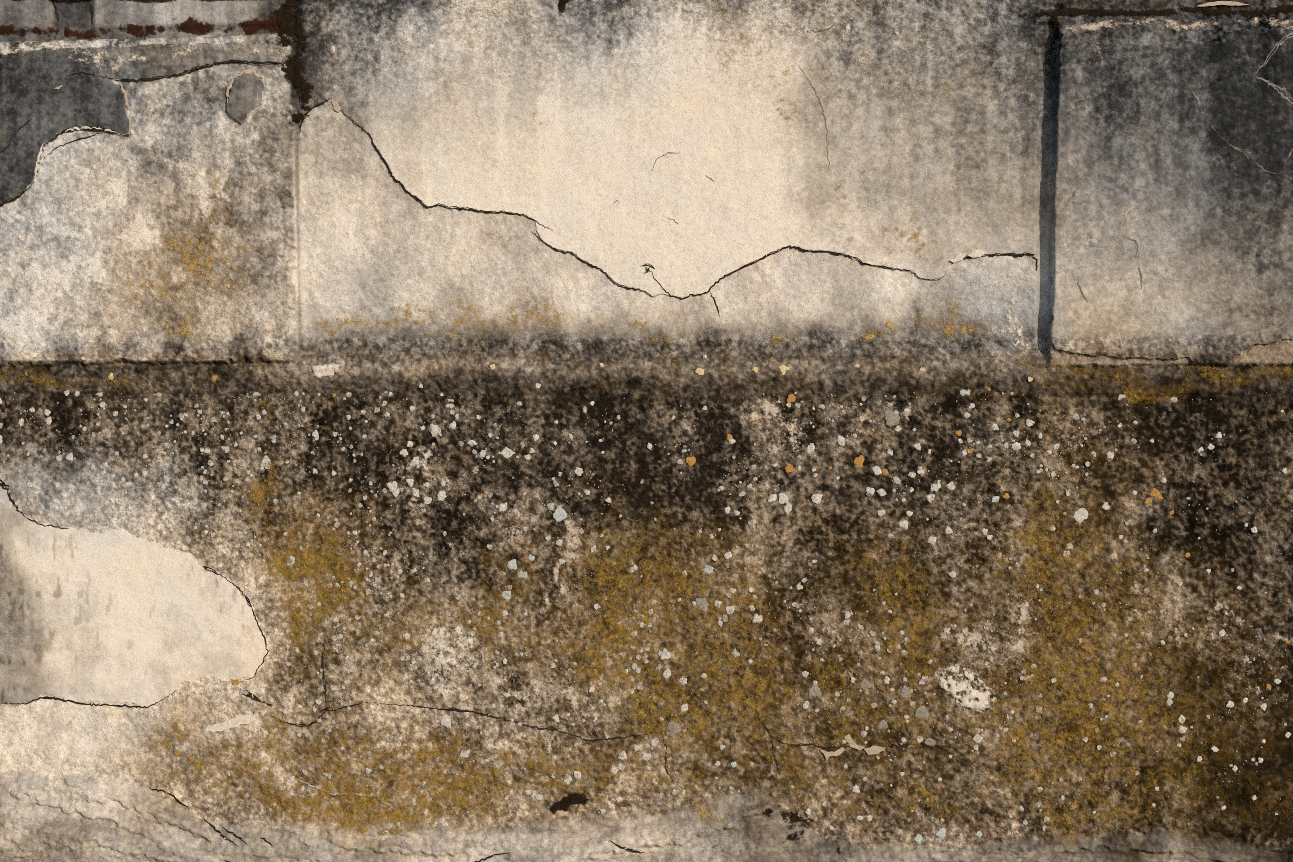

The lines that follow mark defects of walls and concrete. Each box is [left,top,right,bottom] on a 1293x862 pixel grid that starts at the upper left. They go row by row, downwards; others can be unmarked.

damp [278,0,432,116]
damp [569,0,629,27]
damp [769,0,825,35]
peeling [0,0,1039,298]
damp [842,0,1293,316]
peeling [1048,27,1293,367]
damp [806,274,1031,357]
damp [0,334,1047,621]
peeling [0,482,270,707]
damp [403,625,582,766]
damp [941,602,1035,667]
damp [1204,603,1293,662]